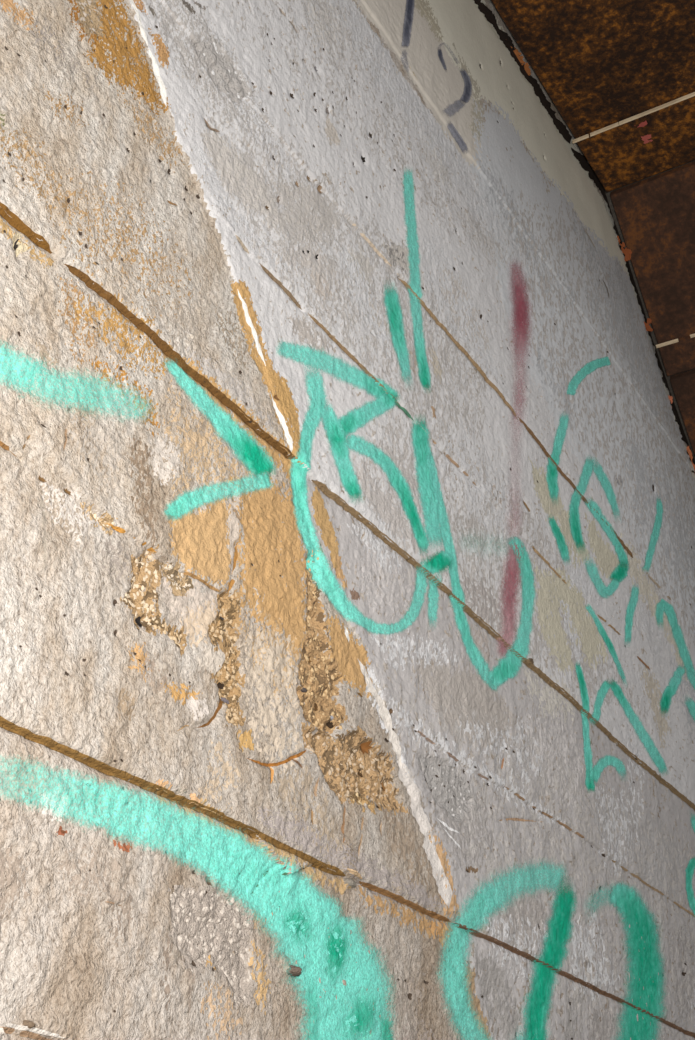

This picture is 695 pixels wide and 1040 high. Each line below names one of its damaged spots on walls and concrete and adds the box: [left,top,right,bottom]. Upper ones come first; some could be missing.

corrosion [511,47,531,76]
crack [0,202,295,459]
crack [235,235,414,421]
crack [344,215,671,600]
crack [474,0,695,474]
spalling [120,544,194,657]
crack [106,494,241,593]
crack [178,694,223,731]
spalling [208,587,246,734]
crack [311,480,695,811]
crack [0,716,695,1038]
crack [2,1027,52,1040]